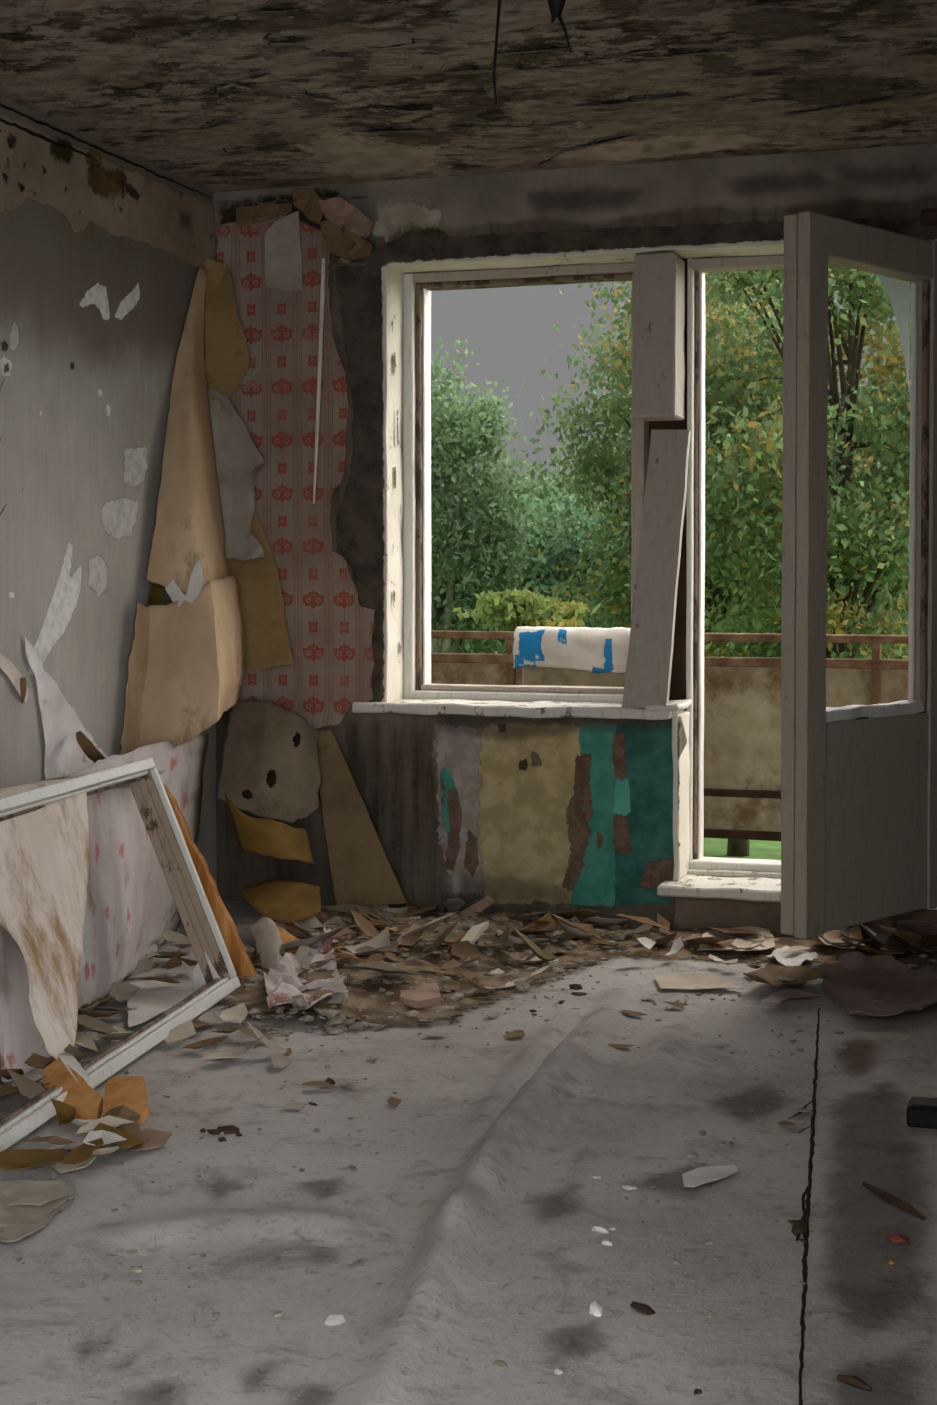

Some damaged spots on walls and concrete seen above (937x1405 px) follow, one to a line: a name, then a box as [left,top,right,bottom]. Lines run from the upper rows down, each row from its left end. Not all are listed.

damp [43,138,74,174]
peeling [429,721,681,907]
crack [788,1008,820,1405]